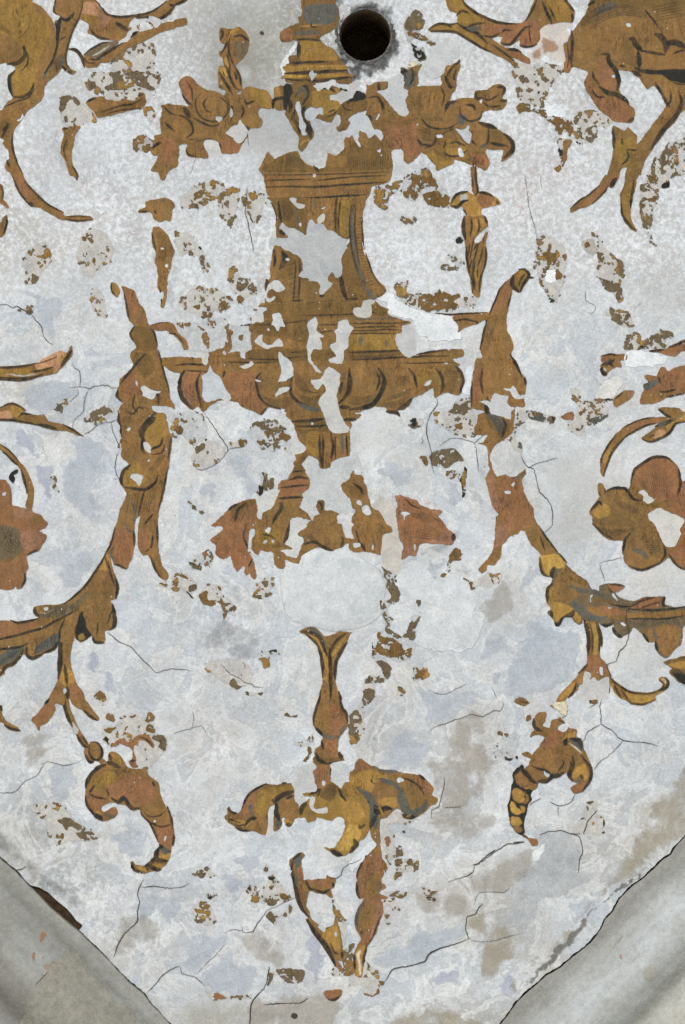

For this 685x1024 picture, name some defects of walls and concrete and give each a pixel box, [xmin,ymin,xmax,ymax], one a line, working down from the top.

peeling [377,10,436,116]
peeling [511,22,612,172]
peeling [269,197,348,295]
peeling [140,266,362,557]
peeling [306,299,375,434]
peeling [408,385,613,477]
crack [520,453,558,533]
crack [584,614,657,768]
crack [114,882,189,955]
crack [151,898,294,989]
crack [249,967,308,1024]
crack [382,795,596,984]